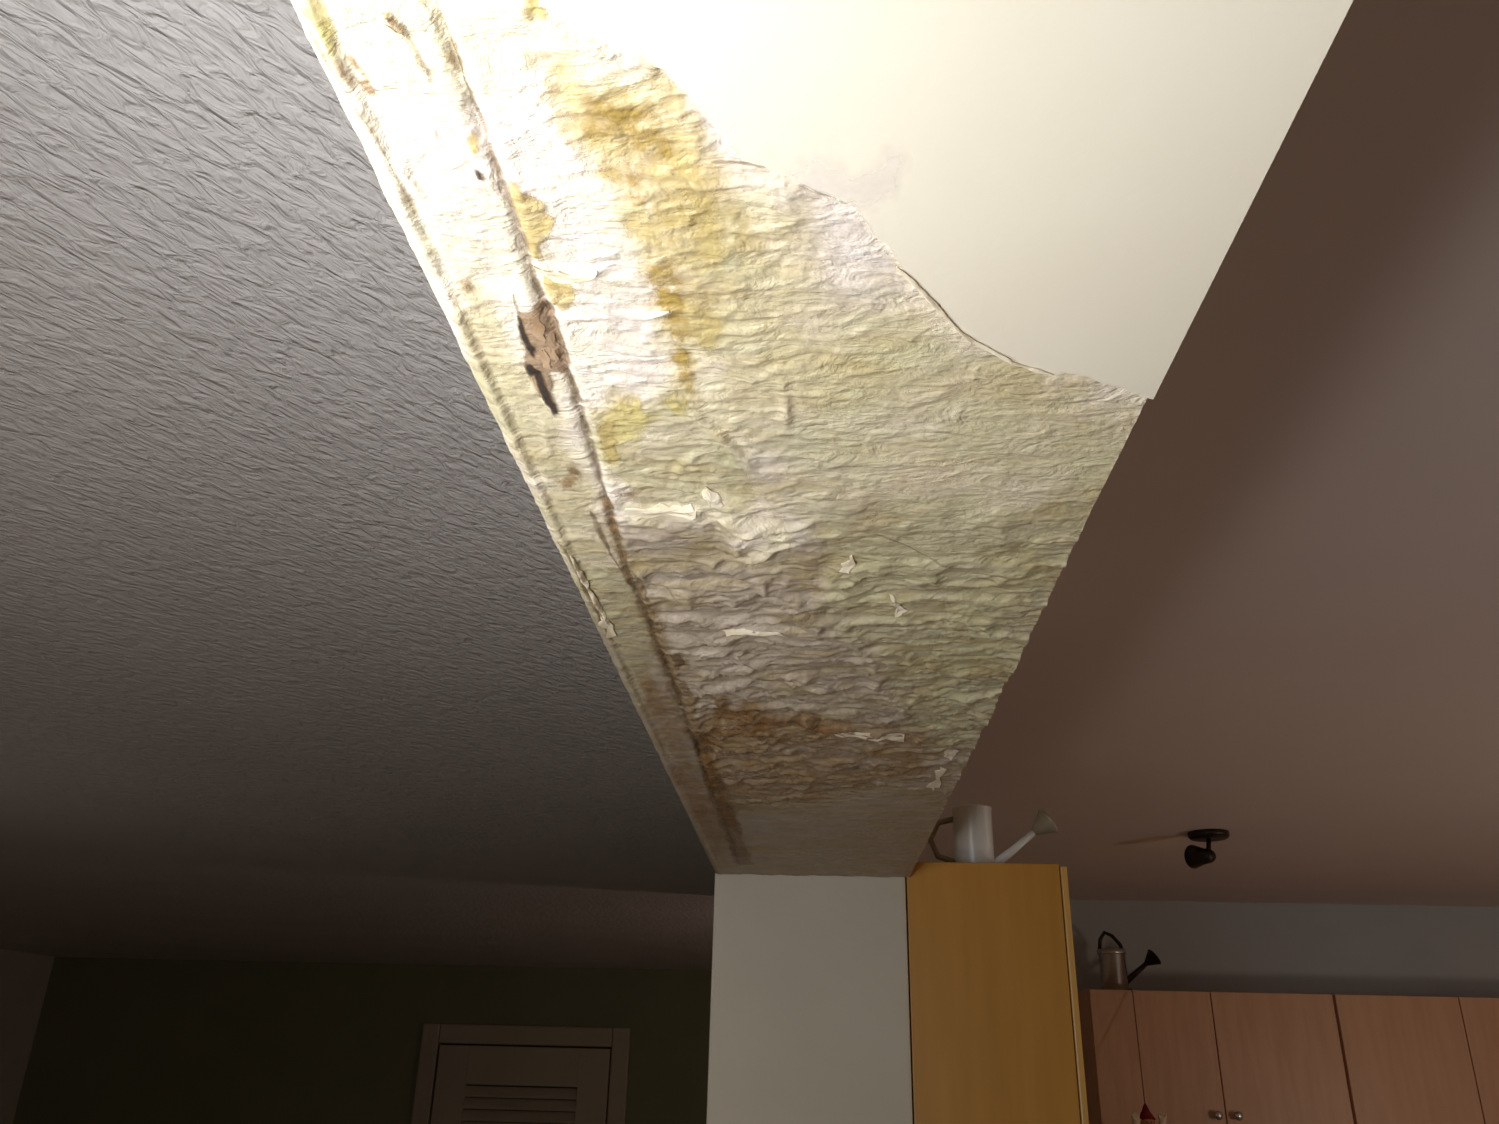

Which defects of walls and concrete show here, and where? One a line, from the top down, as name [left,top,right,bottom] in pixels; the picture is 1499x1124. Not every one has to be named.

leakage [509,184,554,258]
leakage [526,0,545,18]
leakage [544,276,574,309]
crack [420,22,751,864]
peeling [290,0,1147,878]
leakage [553,72,1126,742]